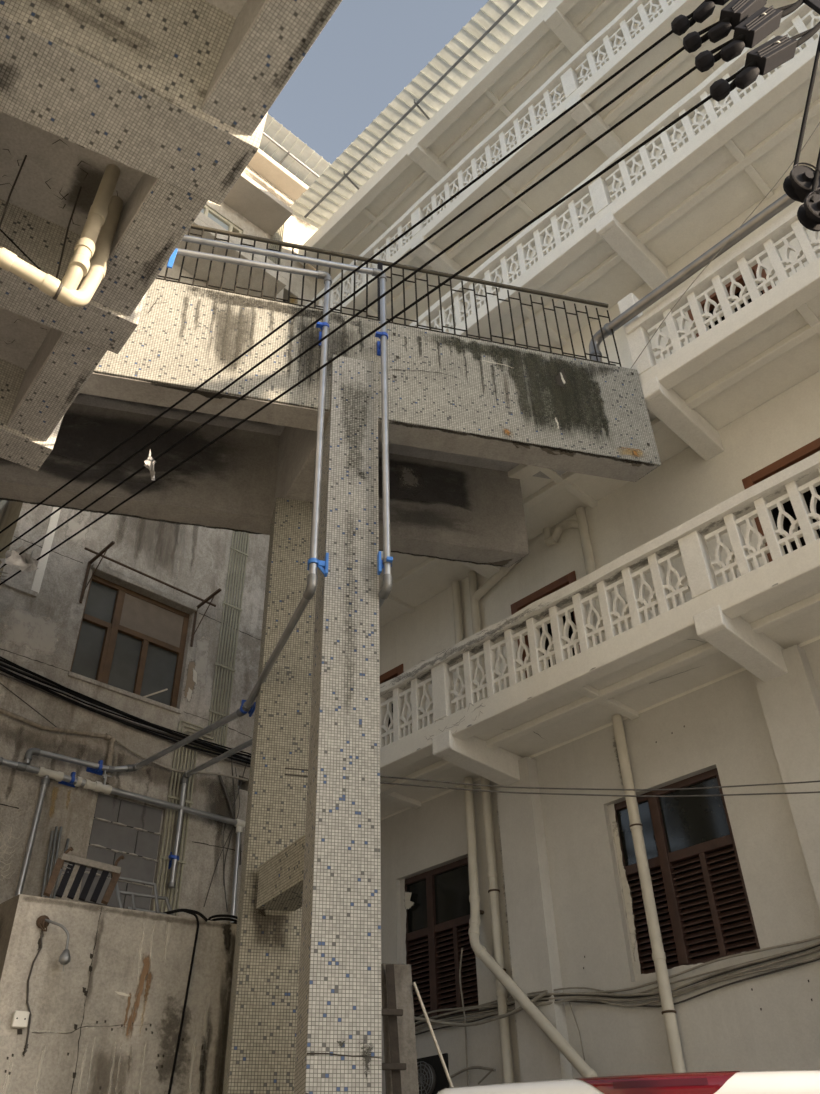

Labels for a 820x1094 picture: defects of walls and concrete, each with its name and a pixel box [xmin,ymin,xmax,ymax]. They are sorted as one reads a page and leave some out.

leakage [45,161,104,226]
leakage [181,287,364,383]
leakage [341,384,370,479]
leakage [405,335,614,436]
crack [32,908,146,1094]
rust [124,955,153,1036]
leakage [158,924,235,1094]
crack [307,1052,382,1060]